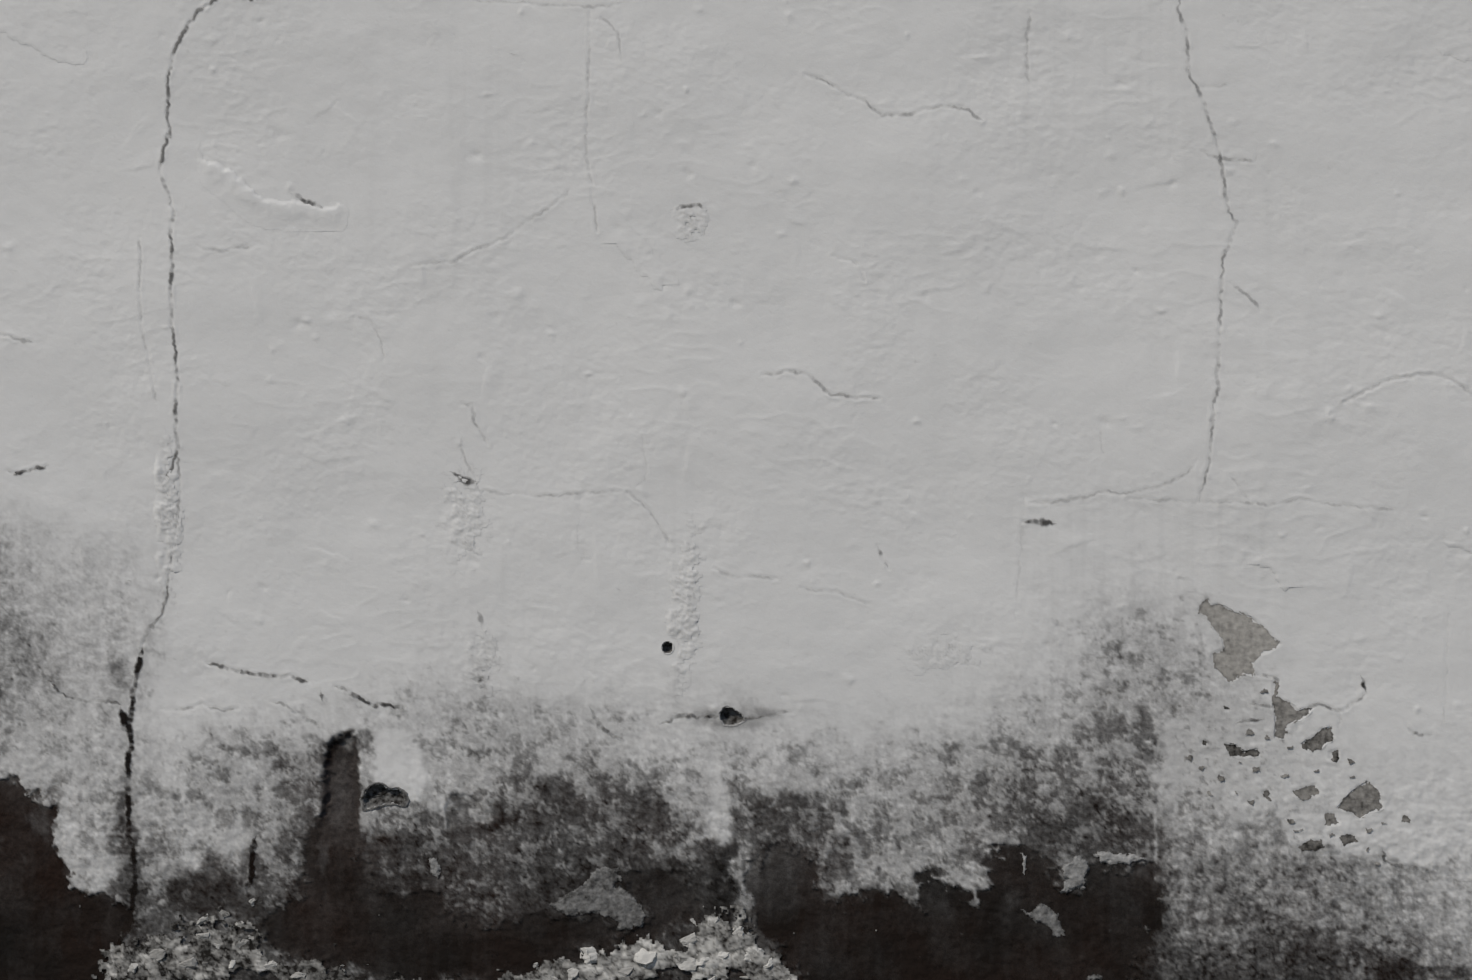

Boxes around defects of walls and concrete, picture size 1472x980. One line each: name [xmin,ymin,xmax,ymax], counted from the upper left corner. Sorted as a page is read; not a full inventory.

crack [161,0,216,162]
crack [111,649,143,821]
crack [209,663,394,708]
water stain [1038,642,1210,766]
peeling [1185,598,1410,866]
water stain [0,775,140,980]
spalling [91,898,367,980]
crack [245,837,256,886]
water stain [259,736,704,980]
spalling [491,866,797,980]
water stain [743,842,1169,980]
water stain [1349,945,1472,980]